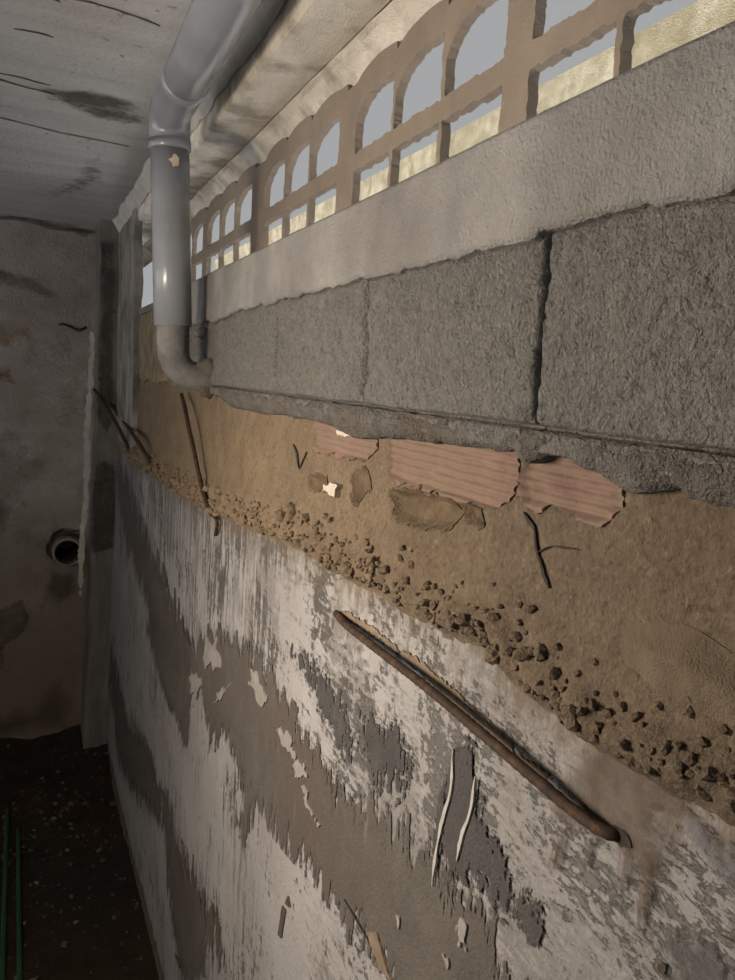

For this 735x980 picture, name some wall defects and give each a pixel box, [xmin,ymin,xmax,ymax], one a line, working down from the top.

crack [54,0,160,27]
crack [0,73,137,147]
spalling [179,393,219,536]
flaking render [308,422,626,533]
peeling [108,462,510,980]
spalling [341,611,551,780]
rust [333,610,677,929]
crack [343,899,393,980]